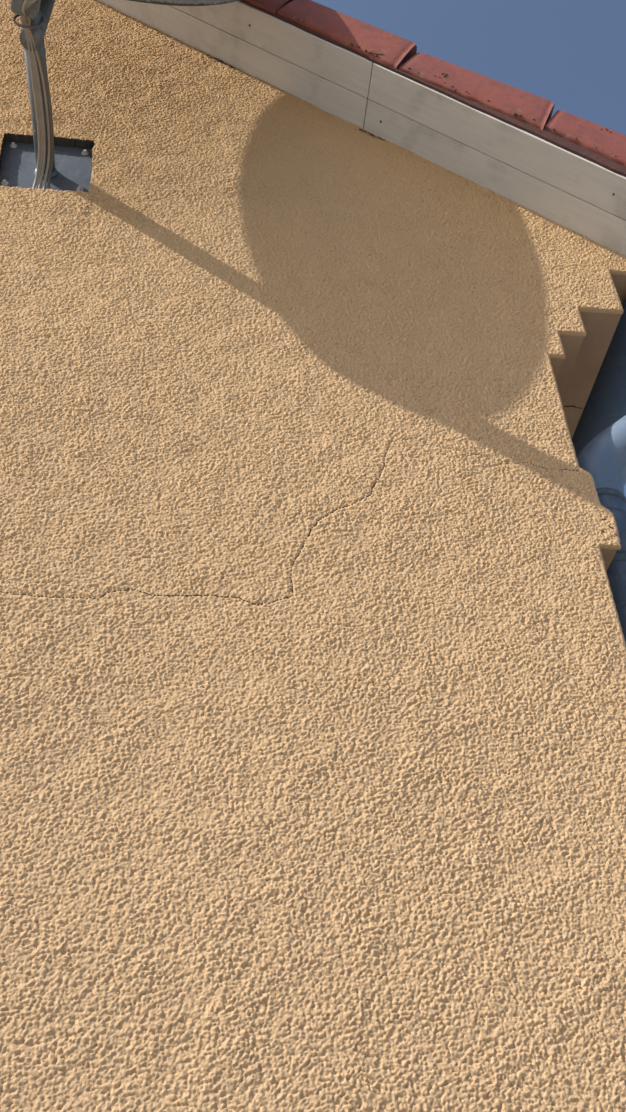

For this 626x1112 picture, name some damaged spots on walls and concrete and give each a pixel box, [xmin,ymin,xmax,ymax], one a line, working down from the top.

crack [0,425,578,605]